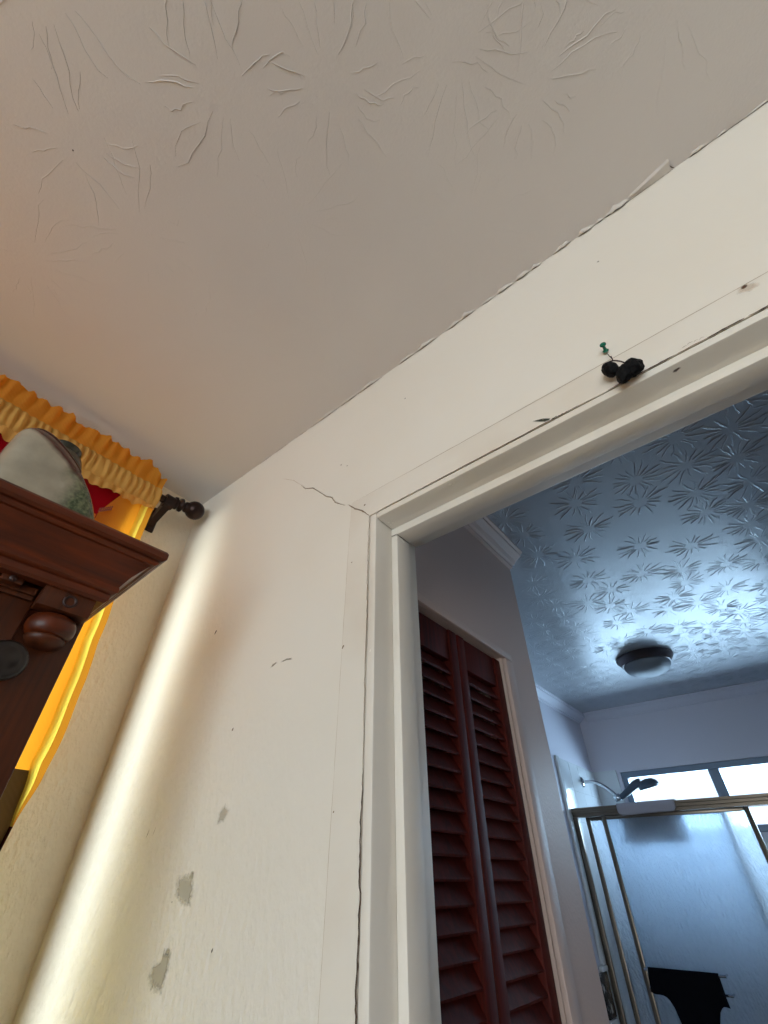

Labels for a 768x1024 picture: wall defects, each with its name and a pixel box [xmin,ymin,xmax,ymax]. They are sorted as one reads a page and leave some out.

crack [288,272,768,1024]